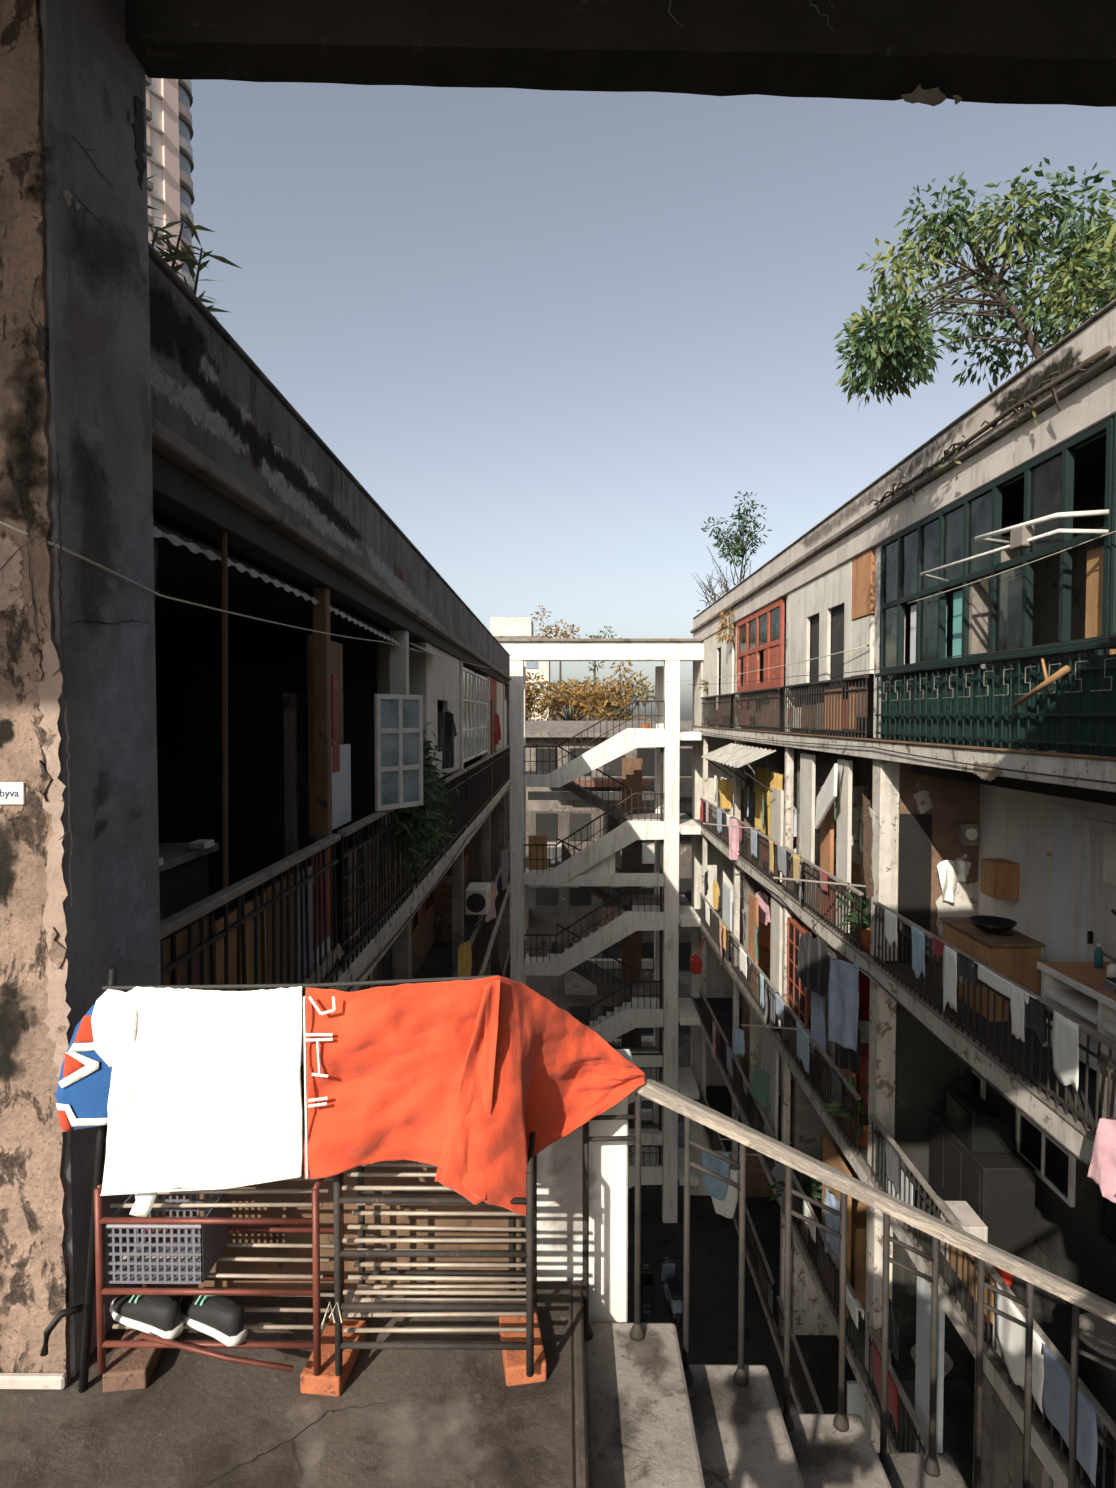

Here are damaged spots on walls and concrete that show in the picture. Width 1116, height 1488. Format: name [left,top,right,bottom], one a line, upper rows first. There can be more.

spalling [901,84,962,106]
water stain [0,342,58,513]
water stain [149,276,361,541]
peeling [0,536,32,611]
water stain [0,719,14,747]
water stain [0,816,17,899]
mould [0,984,33,1081]